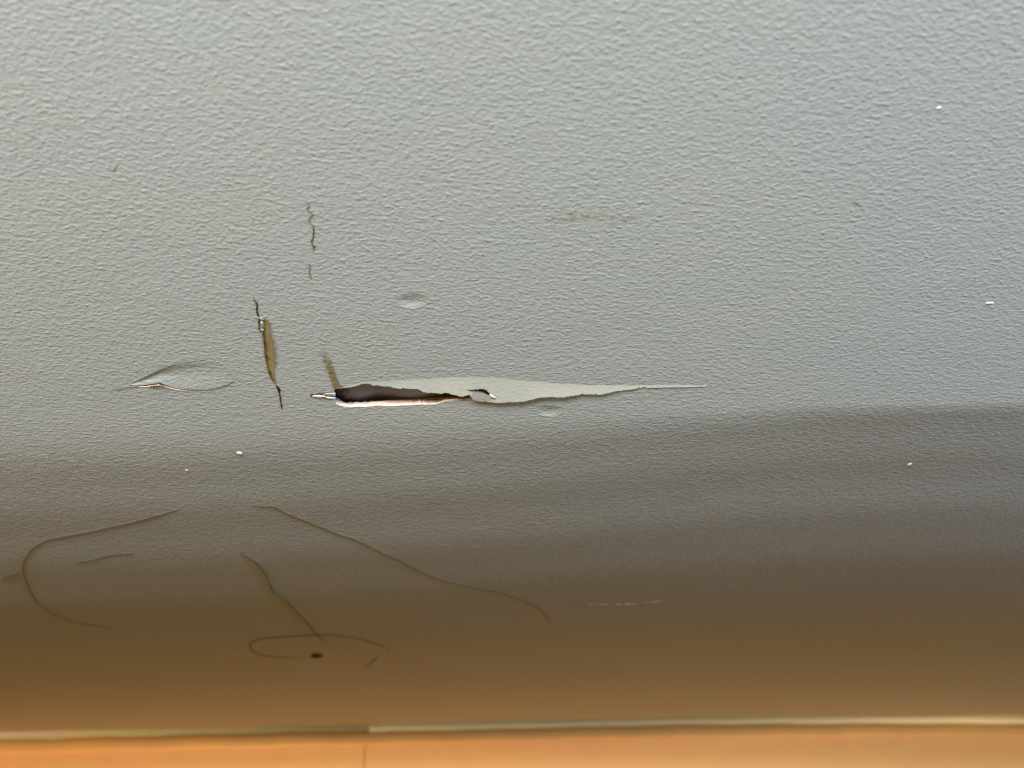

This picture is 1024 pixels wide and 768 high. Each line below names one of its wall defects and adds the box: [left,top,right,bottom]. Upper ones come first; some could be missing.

crack [253,298,282,409]
peeling [339,377,706,403]